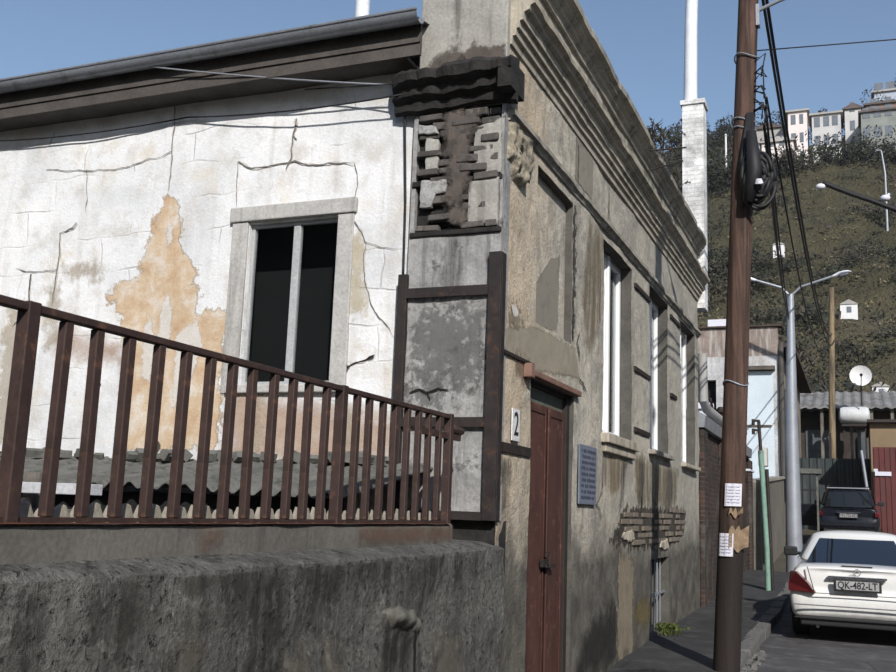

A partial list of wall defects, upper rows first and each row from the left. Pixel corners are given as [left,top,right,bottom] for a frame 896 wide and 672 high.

crack [16,105,176,306]
crack [236,119,358,206]
spalling [410,107,503,238]
peeling [105,194,226,452]
crack [347,355,375,368]
crack [354,221,393,336]
water stain [578,603,617,672]
flaking render [609,503,687,661]